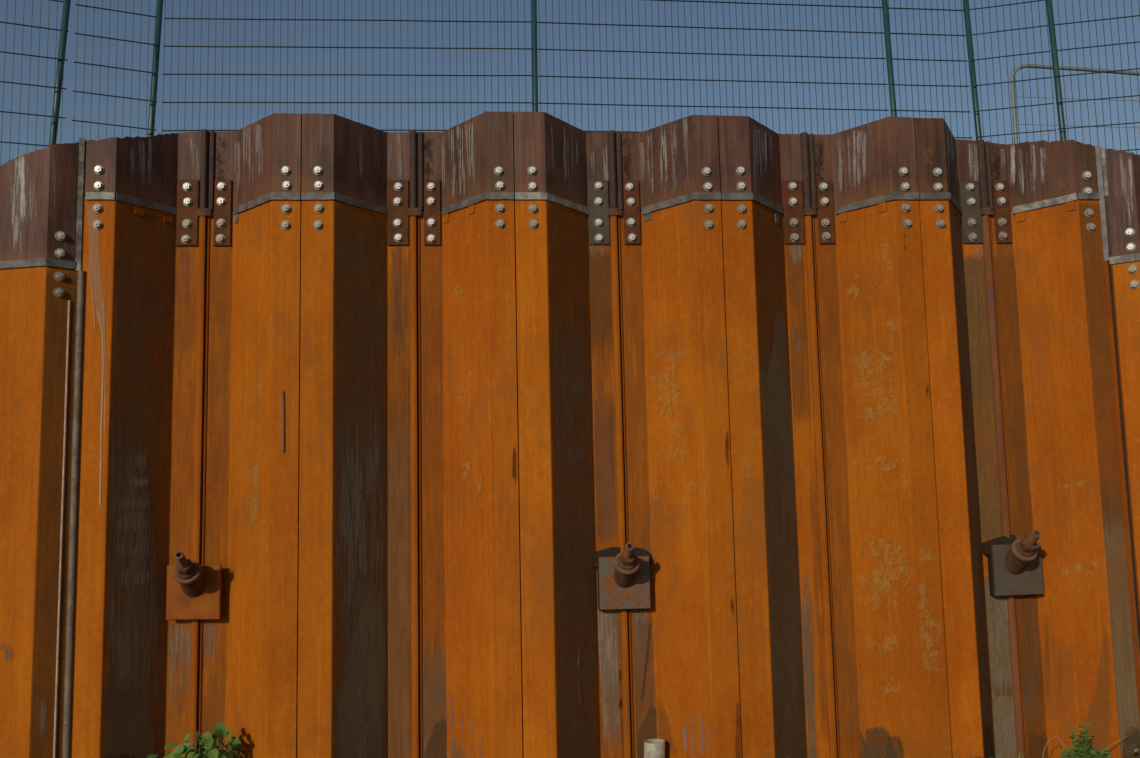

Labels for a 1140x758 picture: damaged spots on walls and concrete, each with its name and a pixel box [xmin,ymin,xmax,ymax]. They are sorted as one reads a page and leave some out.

leakage [100,206,191,758]
leakage [332,205,444,758]
leakage [753,207,817,758]